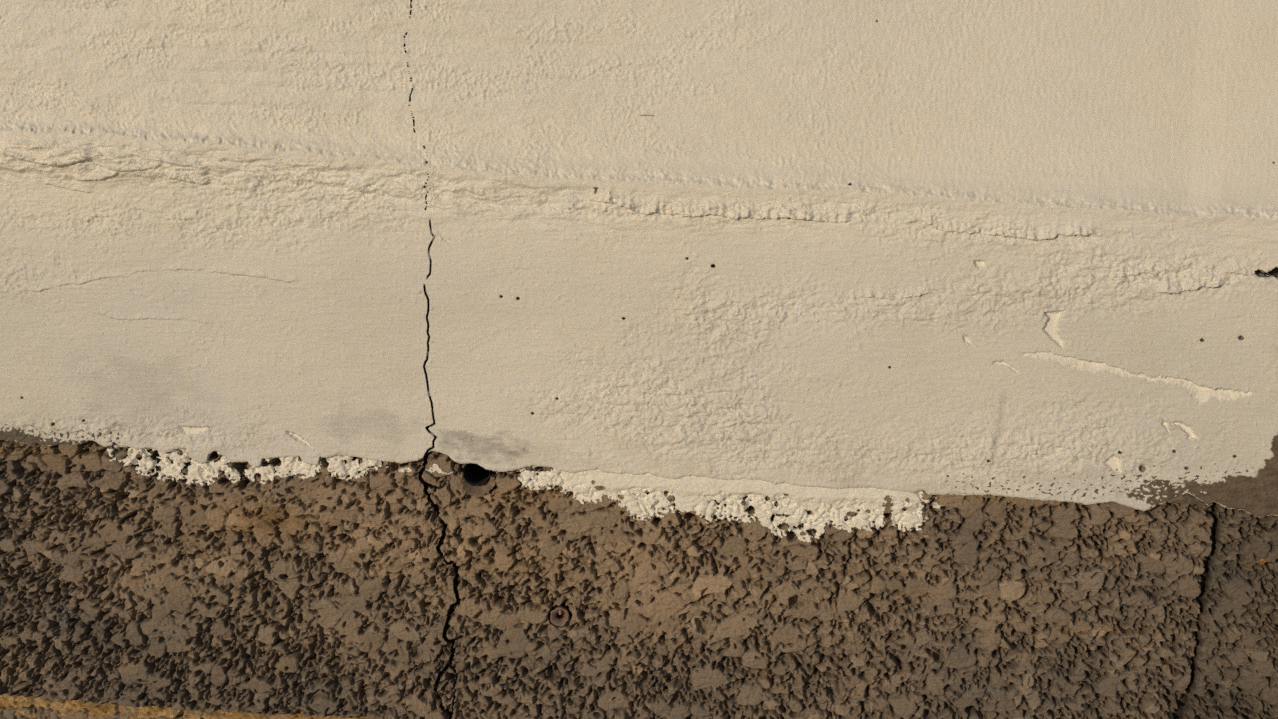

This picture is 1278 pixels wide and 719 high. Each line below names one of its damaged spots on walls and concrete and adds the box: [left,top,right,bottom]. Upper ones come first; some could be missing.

crack [403,0,461,719]
peeling [0,424,122,461]
spalling [461,476,495,499]
peeling [918,435,1278,528]